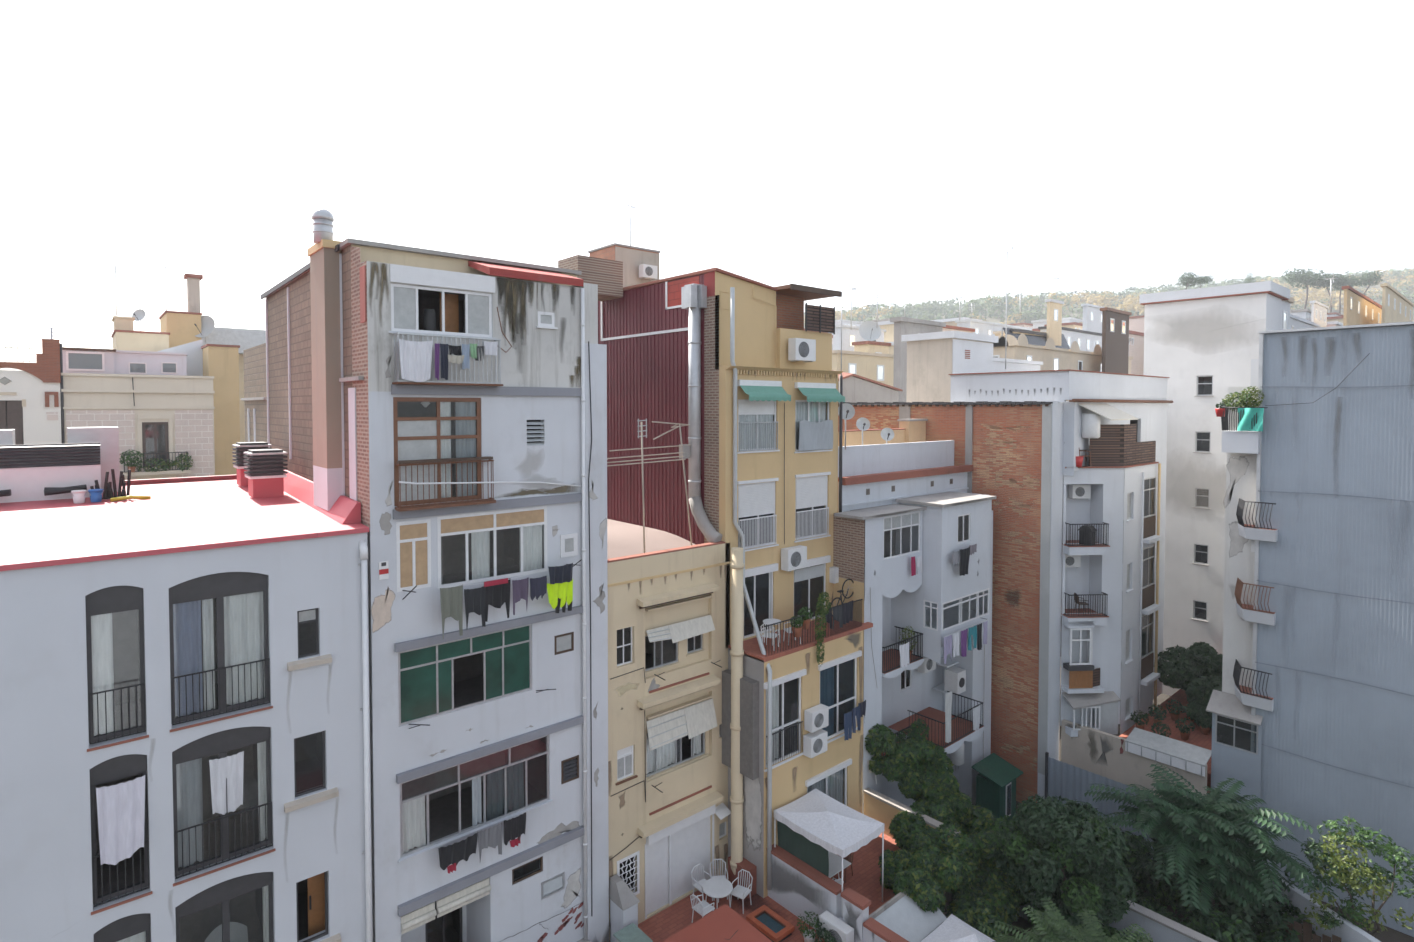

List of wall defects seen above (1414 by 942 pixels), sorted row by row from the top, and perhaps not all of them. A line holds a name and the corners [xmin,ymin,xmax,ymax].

leakage [369,262,388,305]
leakage [498,278,556,329]